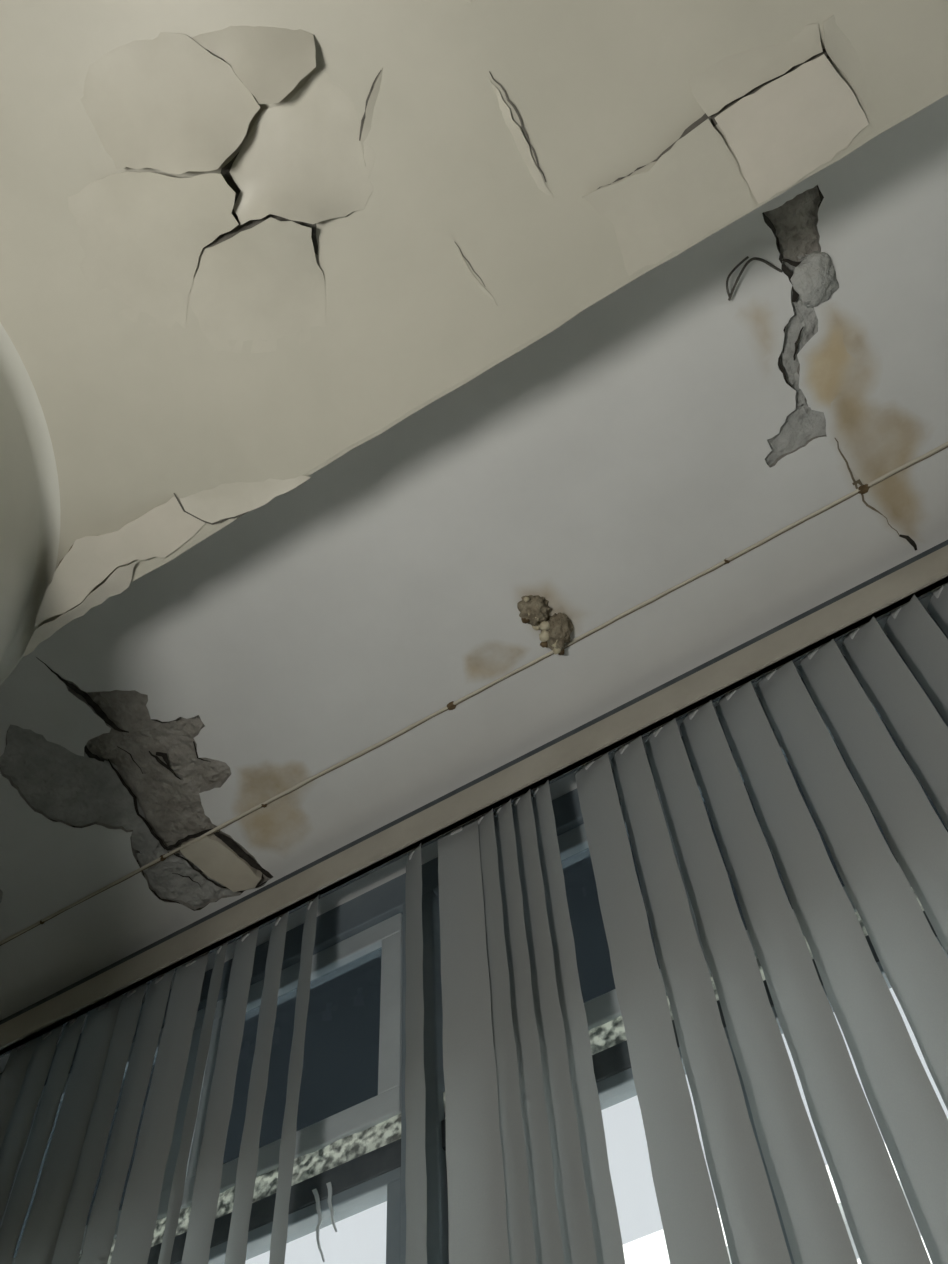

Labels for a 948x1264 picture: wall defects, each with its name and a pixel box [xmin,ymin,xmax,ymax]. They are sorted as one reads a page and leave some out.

peeling [582,15,869,468]
leakage [726,293,785,390]
leakage [797,298,938,550]
spalling [0,475,311,911]
crack [0,438,948,946]